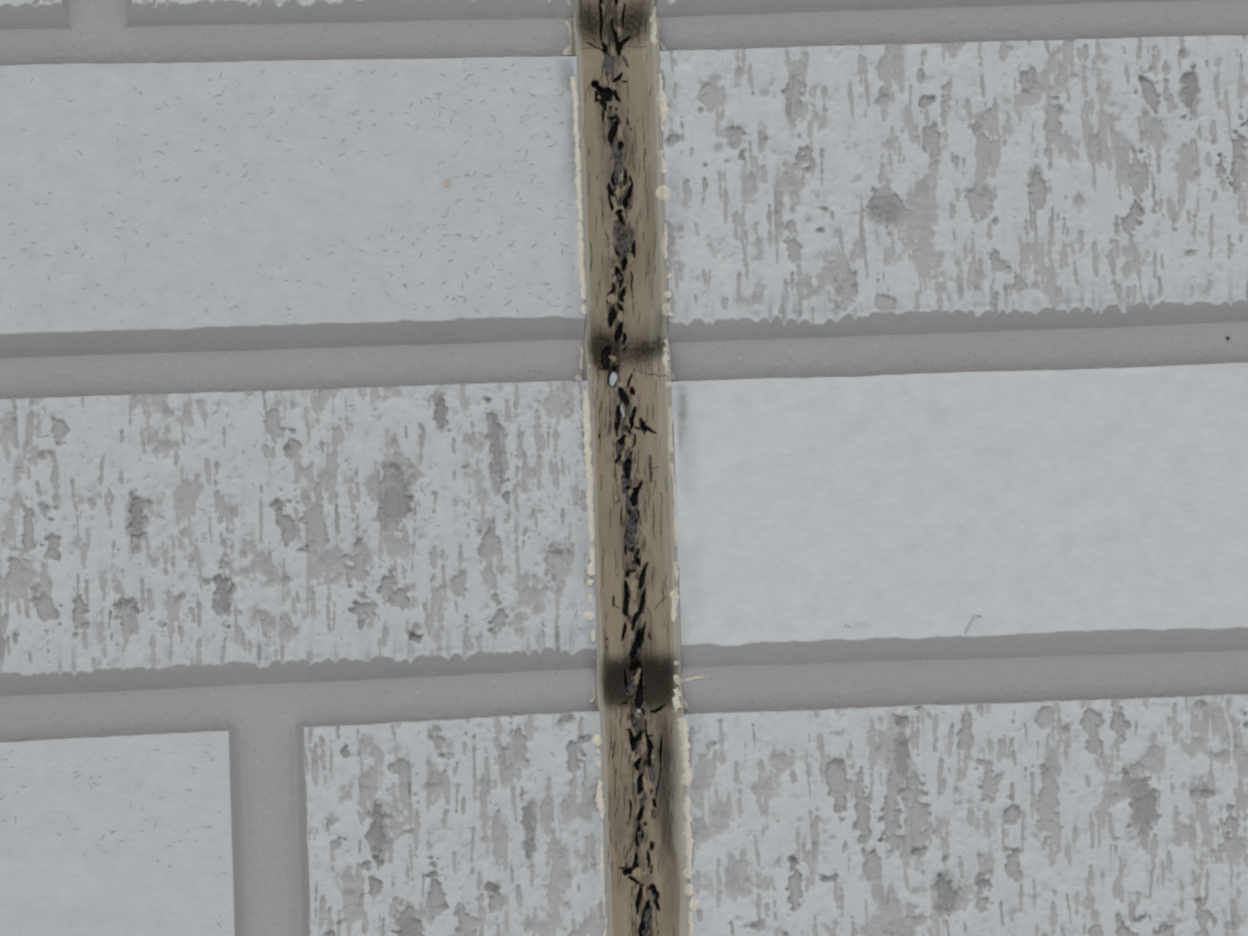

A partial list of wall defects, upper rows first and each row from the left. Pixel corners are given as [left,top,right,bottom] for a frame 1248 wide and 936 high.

crack [1,0,675,936]